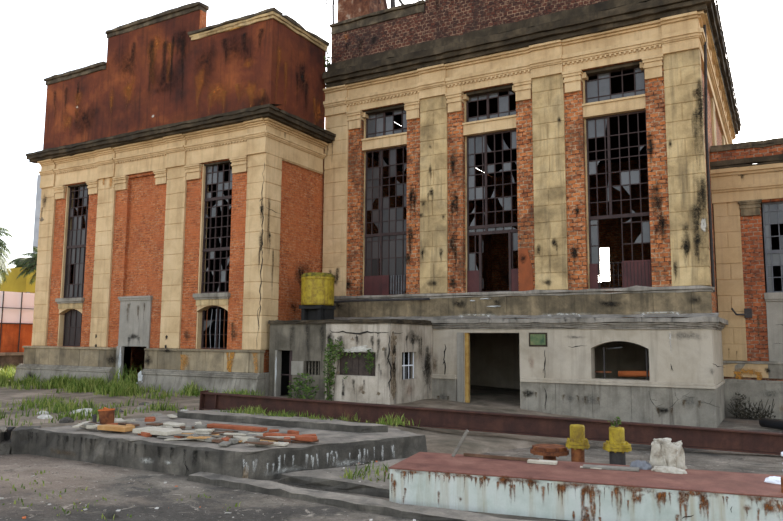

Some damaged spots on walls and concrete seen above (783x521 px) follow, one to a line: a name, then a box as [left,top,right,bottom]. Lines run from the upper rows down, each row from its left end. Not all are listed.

leakage [693,81,706,137]
crack [256,163,280,341]
leakage [682,180,707,252]
corrosion [429,472,643,521]